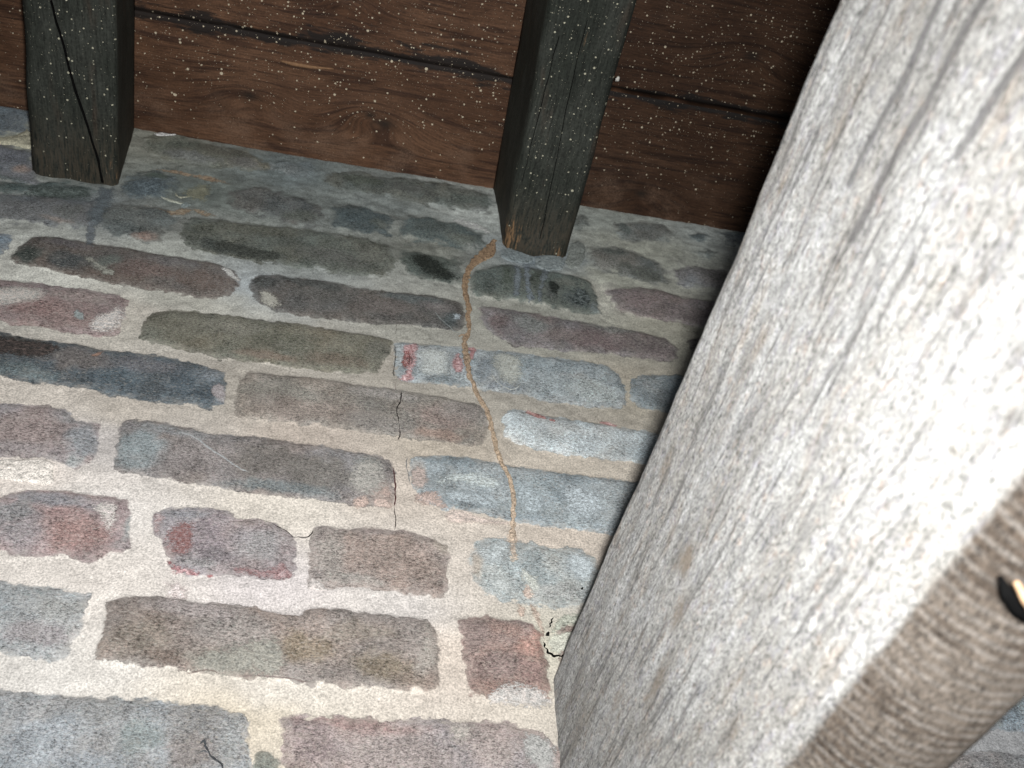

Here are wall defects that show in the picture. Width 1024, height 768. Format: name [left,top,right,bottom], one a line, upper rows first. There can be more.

crack [393,324,410,530]